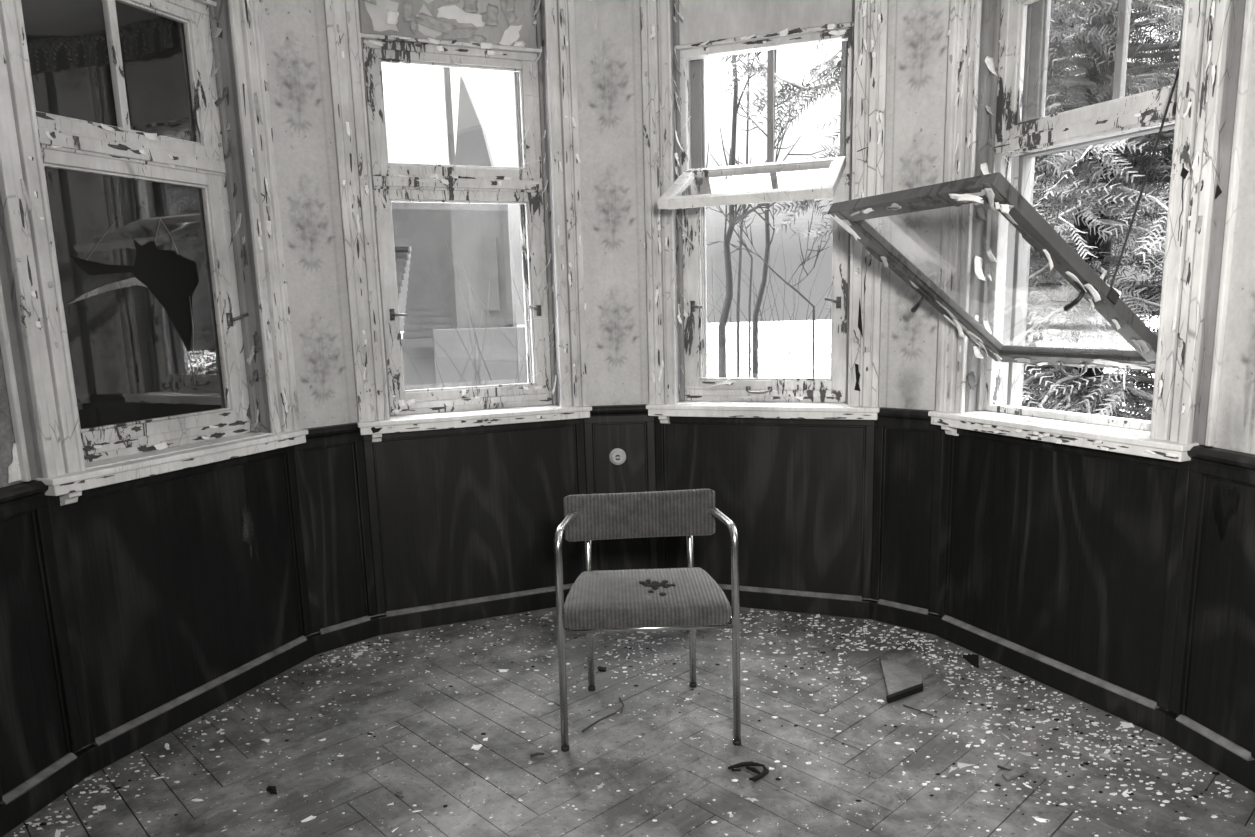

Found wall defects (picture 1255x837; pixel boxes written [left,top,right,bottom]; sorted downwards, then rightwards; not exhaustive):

peeling [97,123,161,160]
peeling [338,104,581,294]
peeling [363,0,568,64]
peeling [691,27,803,52]
peeling [821,24,883,145]
peeling [985,40,1000,76]
peeling [1179,145,1204,286]
peeling [1182,0,1220,119]
peeling [193,281,290,440]
peeling [360,278,499,433]
peeling [935,268,1164,398]
peeling [83,426,174,459]